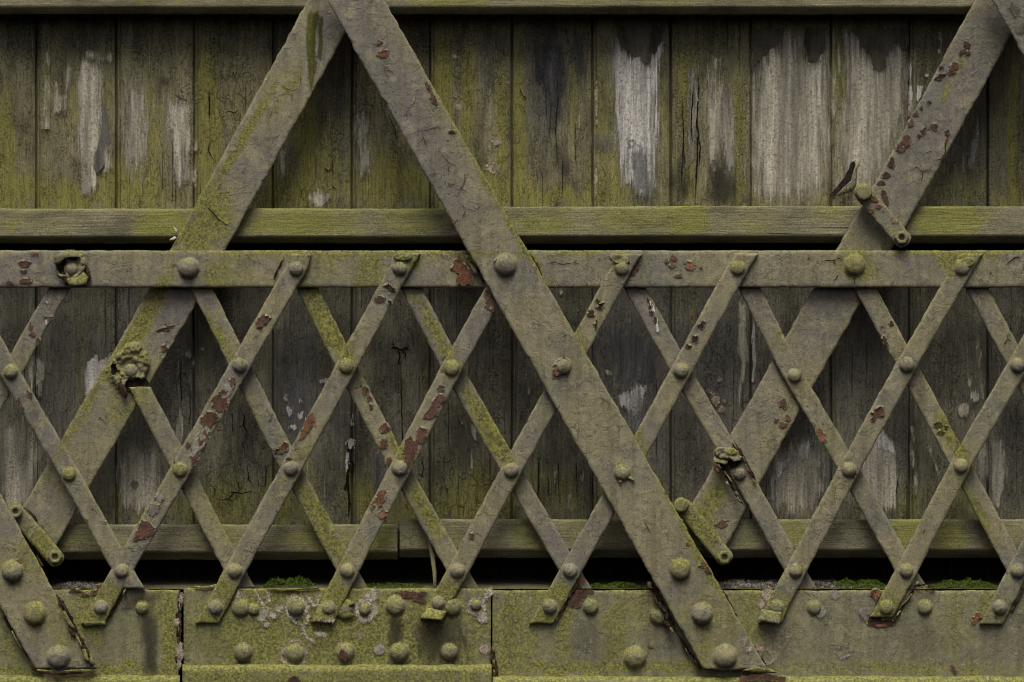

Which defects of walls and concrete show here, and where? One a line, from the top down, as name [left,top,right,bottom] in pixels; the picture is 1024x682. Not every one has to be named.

rust [934,40,971,81]
crack [681,61,701,196]
rust [868,99,950,213]
rust [450,253,498,312]
rust [185,376,236,466]
rust [378,384,446,470]
rust [133,518,156,541]